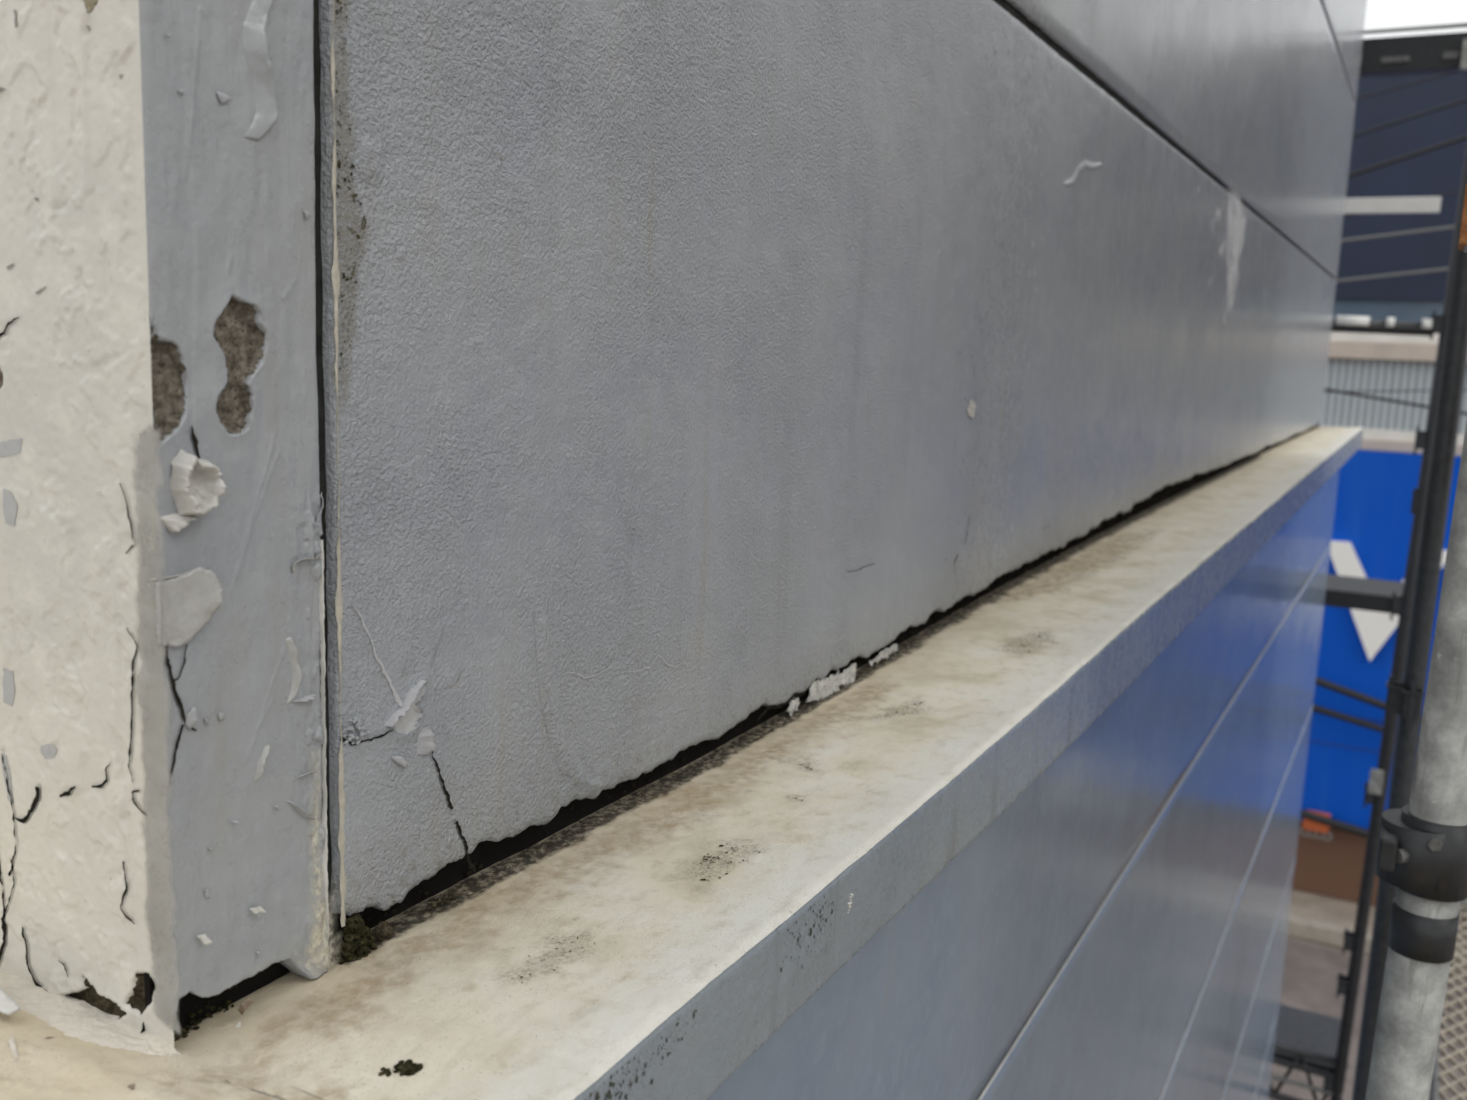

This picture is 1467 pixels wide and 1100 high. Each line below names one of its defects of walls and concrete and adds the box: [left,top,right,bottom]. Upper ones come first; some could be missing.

peeling [243,0,279,140]
spalling [150,325,188,450]
spalling [214,298,265,435]
crack [191,426,200,459]
crack [120,483,134,554]
peeling [149,567,223,647]
peeling [342,679,436,767]
crack [340,605,476,873]
peeling [787,644,898,716]
crack [0,628,197,992]
water stain [781,897,834,972]
water stain [585,1009,697,1100]